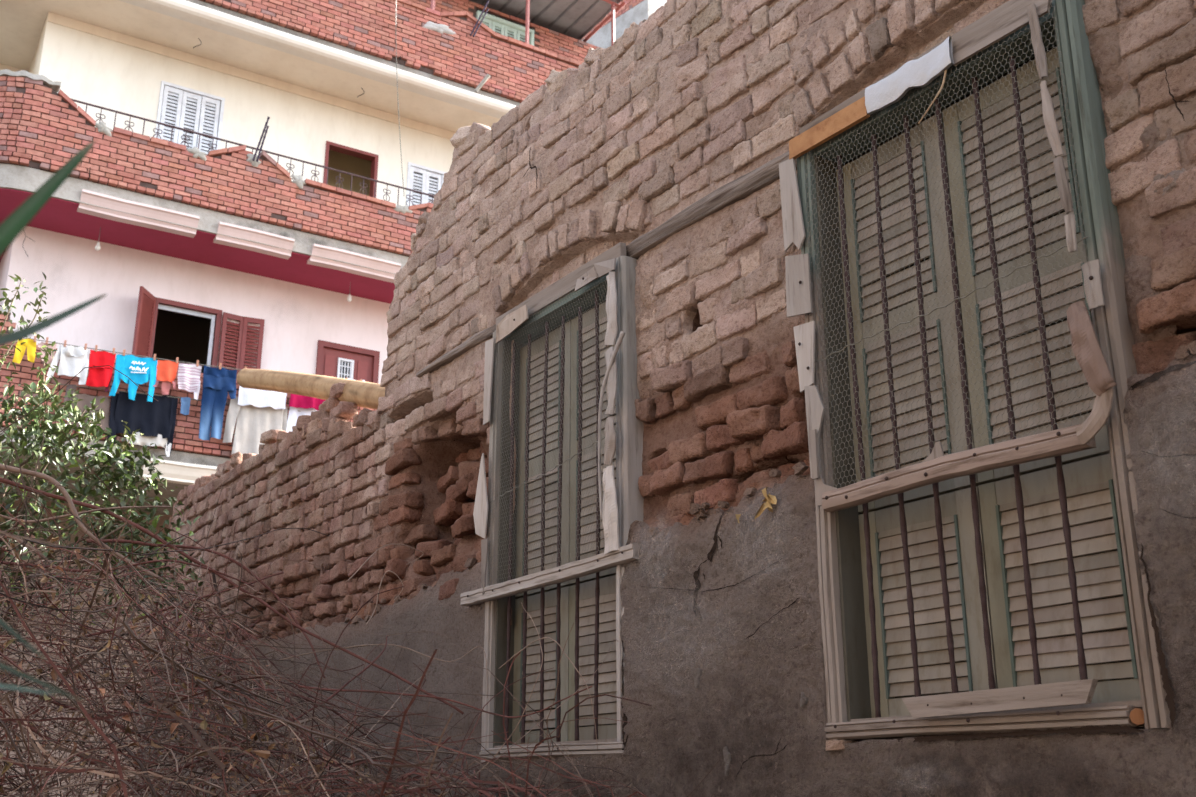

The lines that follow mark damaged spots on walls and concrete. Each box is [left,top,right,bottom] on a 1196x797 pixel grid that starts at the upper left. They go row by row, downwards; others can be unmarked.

spalling [679,462,810,525]
crack [640,514,785,622]